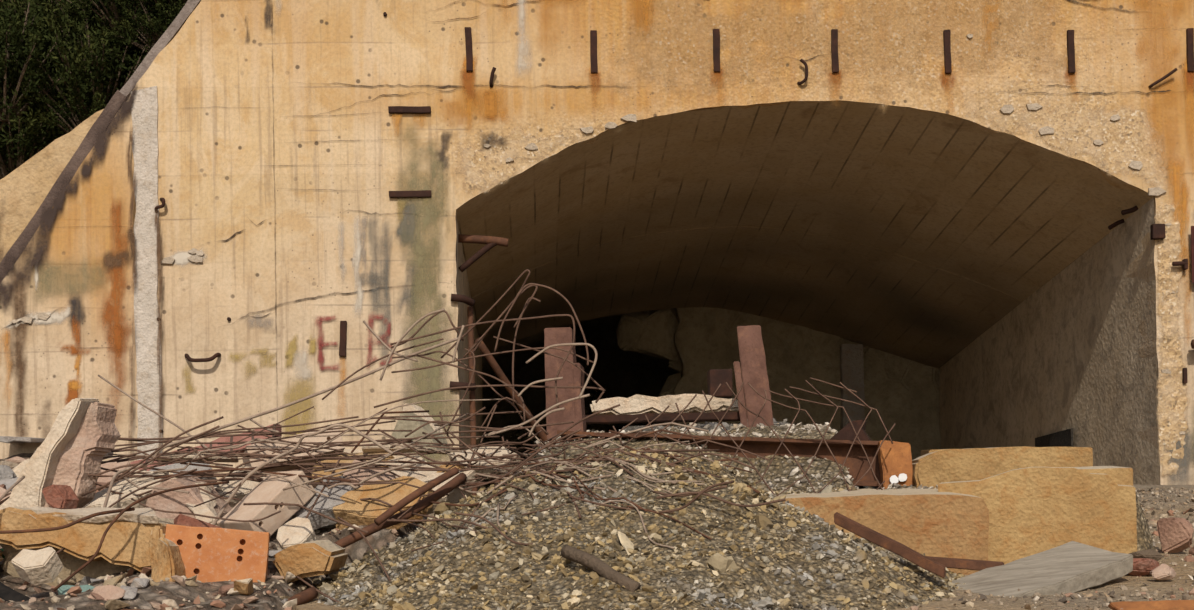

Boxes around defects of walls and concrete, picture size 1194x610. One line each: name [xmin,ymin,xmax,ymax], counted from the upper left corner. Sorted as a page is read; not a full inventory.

crack [333,83,607,110]
rust [463,58,505,119]
rust [63,297,88,404]
rust [103,131,136,458]
crack [241,287,389,318]
leakage [342,135,454,429]